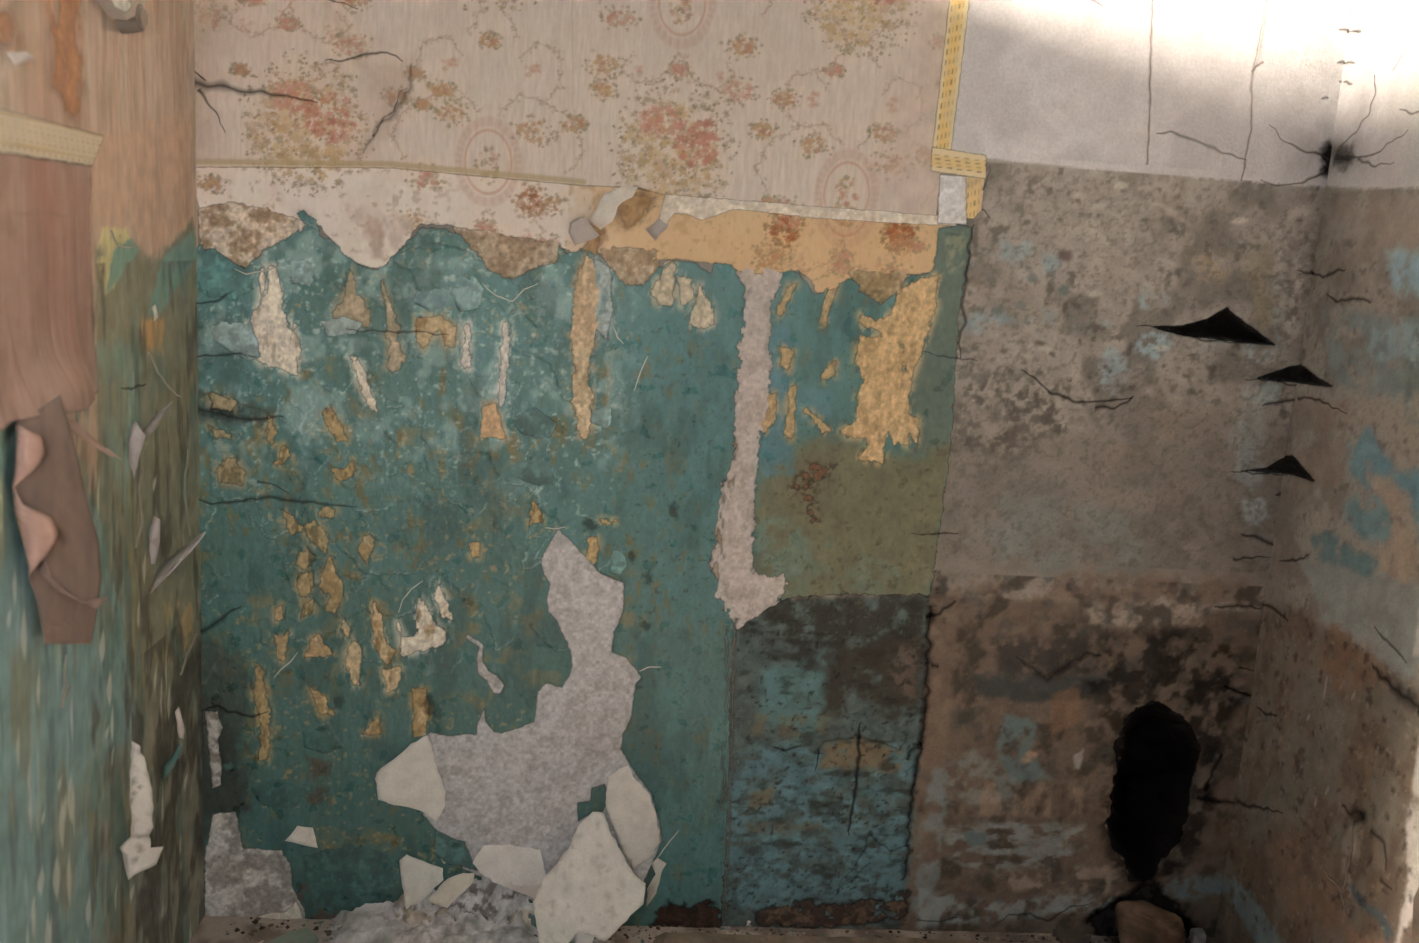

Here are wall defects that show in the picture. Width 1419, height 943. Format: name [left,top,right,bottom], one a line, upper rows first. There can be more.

crack [195,72,318,132]
crack [1241,0,1419,186]
peeling [751,224,973,602]
crack [1140,307,1347,414]
crack [1231,456,1314,496]
peeling [150,210,746,943]